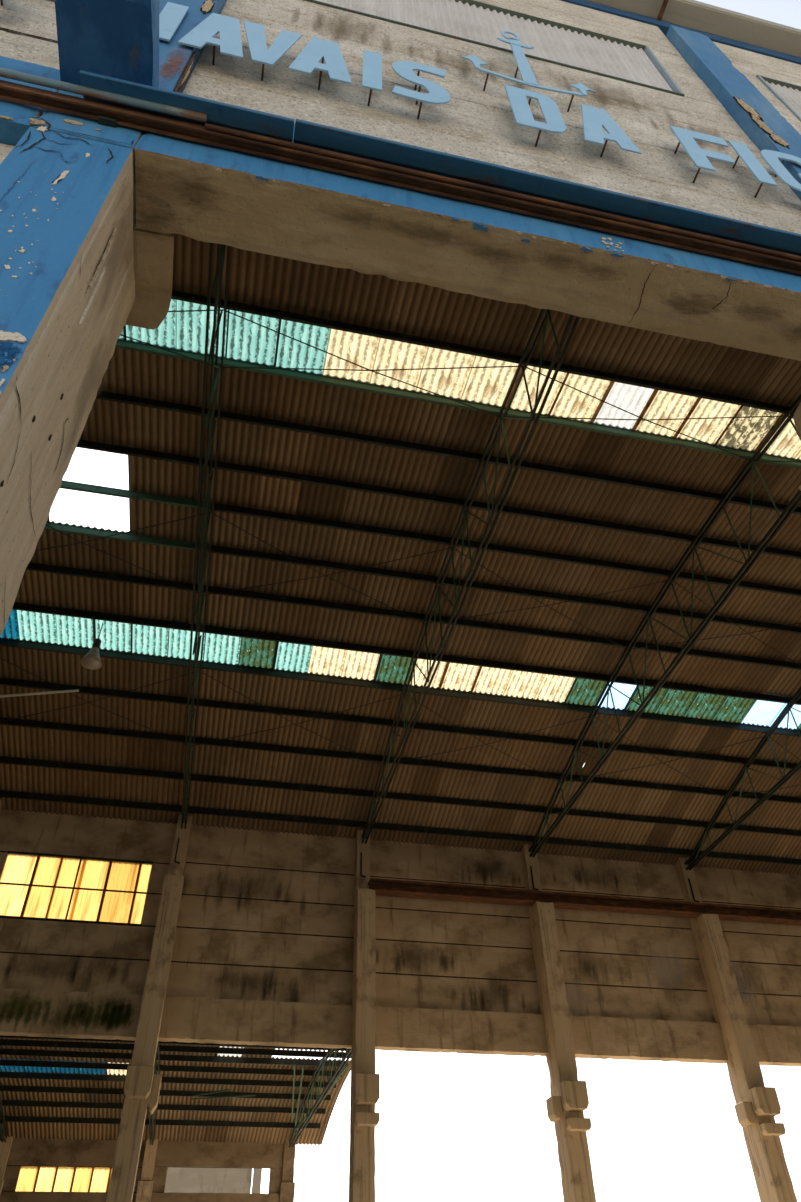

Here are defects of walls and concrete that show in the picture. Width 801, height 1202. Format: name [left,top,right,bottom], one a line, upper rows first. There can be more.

spalling [200,0,215,14]
spalling [0,115,101,132]
spalling [733,96,790,149]
crack [0,127,134,200]
peeling [0,171,69,233]
spalling [79,227,117,324]
peeling [0,330,27,396]